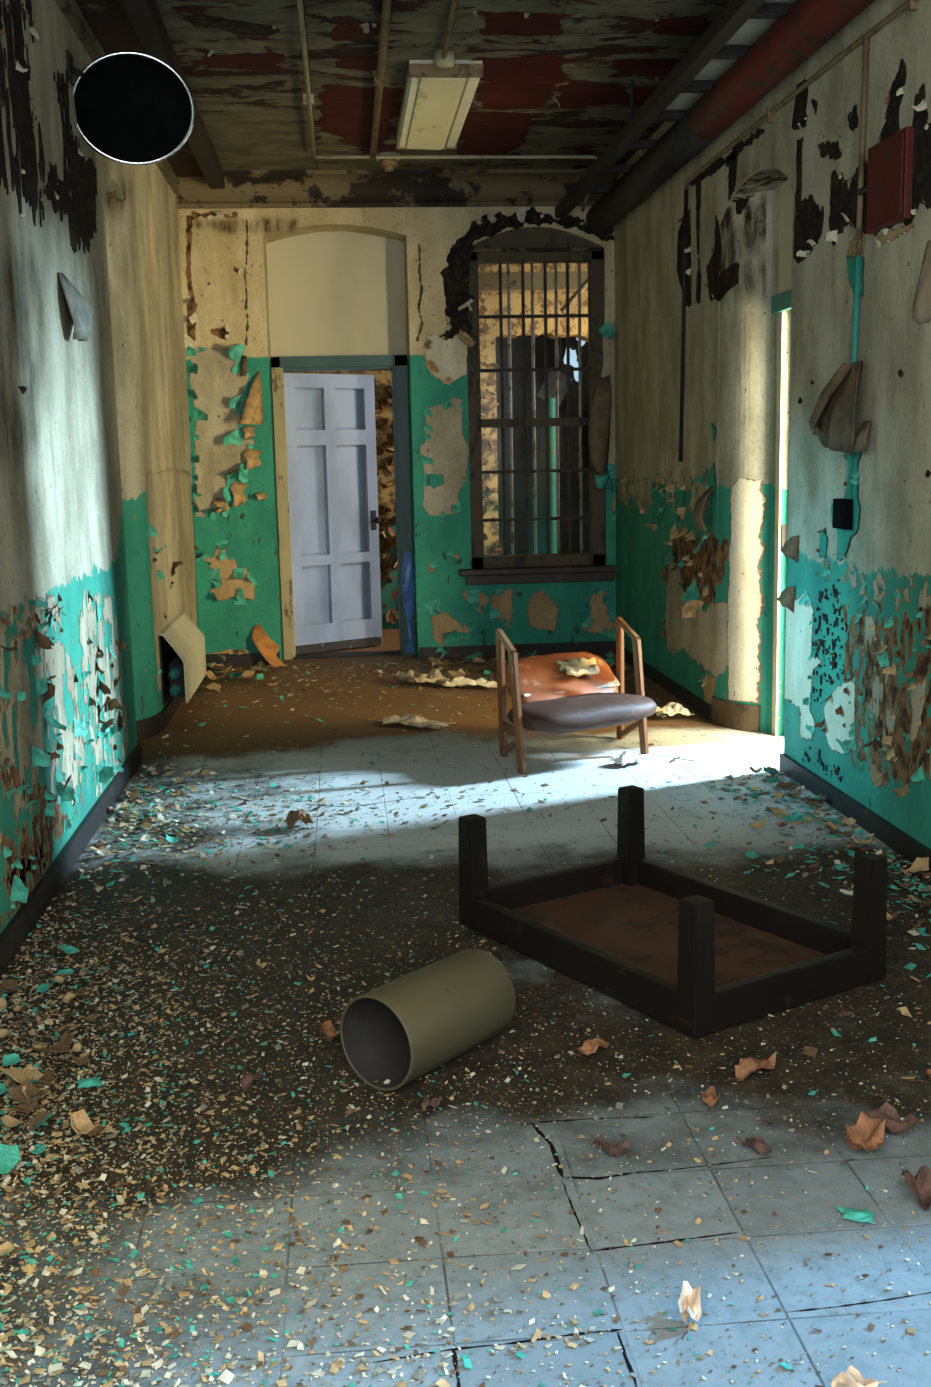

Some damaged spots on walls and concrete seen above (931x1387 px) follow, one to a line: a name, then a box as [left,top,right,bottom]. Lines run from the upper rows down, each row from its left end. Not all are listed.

peeling [0,0,97,254]
peeling [454,55,681,161]
peeling [677,128,764,307]
peeling [791,59,931,263]
peeling [146,211,269,692]
peeling [414,206,615,555]
peeling [211,624,285,668]
peeling [588,321,931,799]
peeling [0,588,224,931]
crack [522,1117,777,1254]
crack [373,1329,637,1387]
crack [790,1292,931,1312]